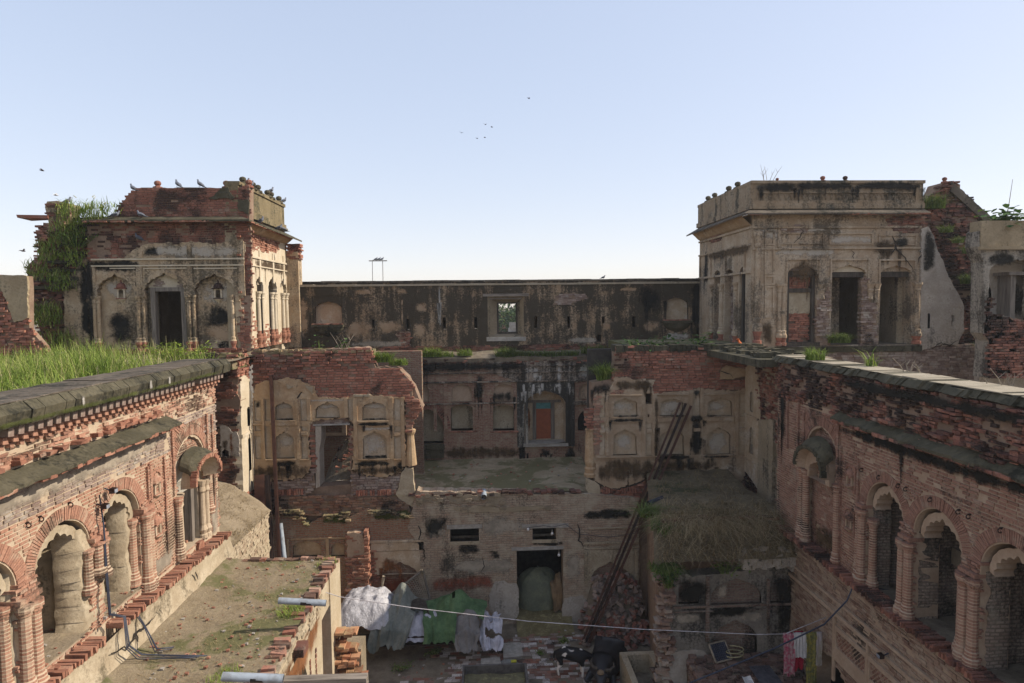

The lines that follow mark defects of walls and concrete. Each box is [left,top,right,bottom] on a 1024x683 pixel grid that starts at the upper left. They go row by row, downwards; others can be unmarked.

water stain [757,182,926,203]
water stain [924,232,936,271]
water stain [80,248,160,349]
water stain [208,307,228,326]
flaking render [84,221,426,399]